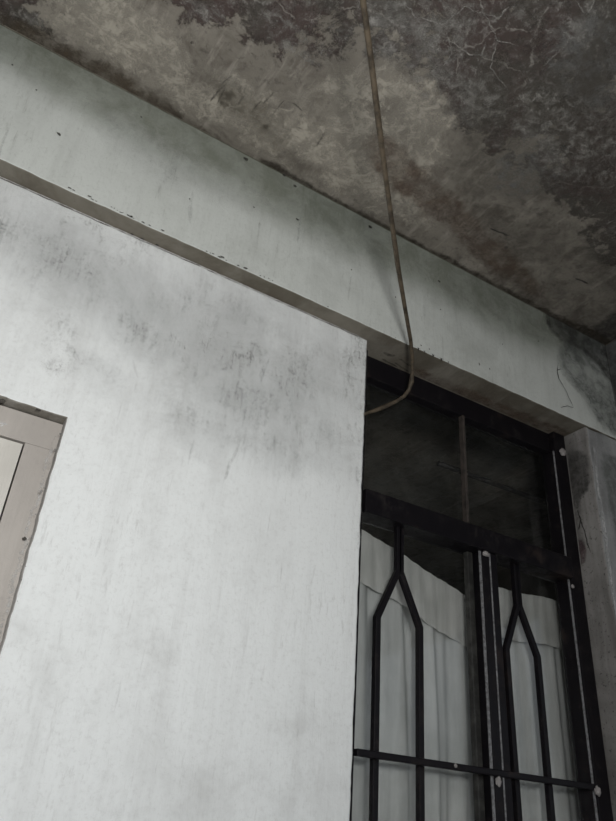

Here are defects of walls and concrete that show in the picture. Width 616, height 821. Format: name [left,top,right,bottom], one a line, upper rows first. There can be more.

leakage [0,0,616,431]
crack [406,5,510,87]